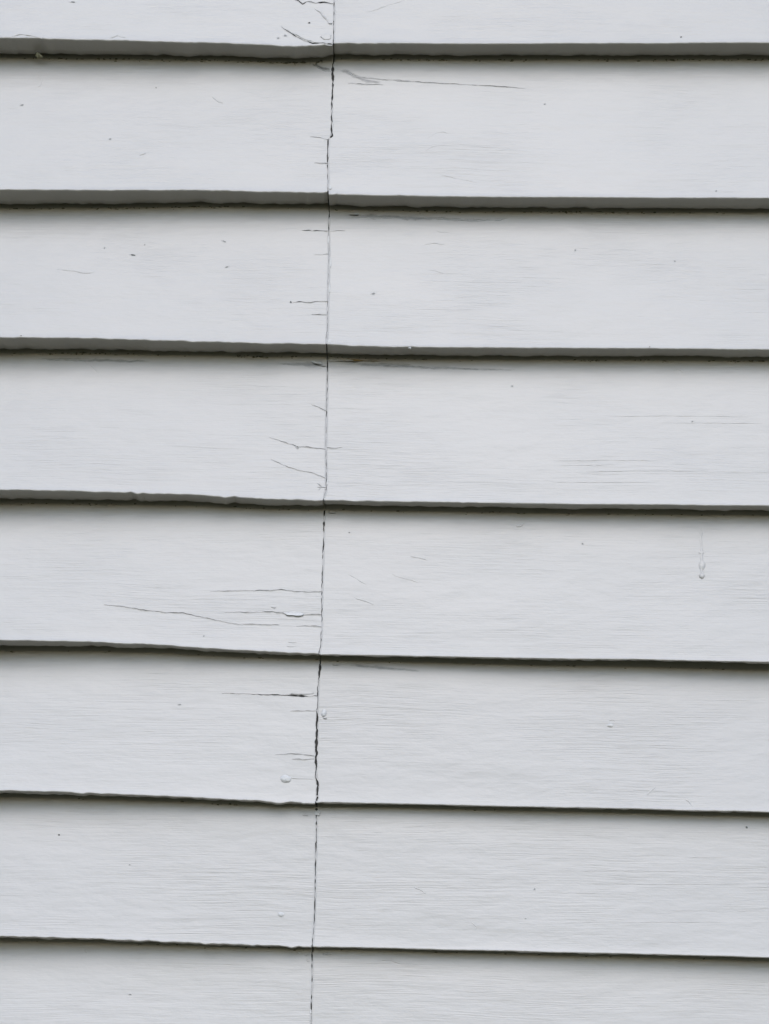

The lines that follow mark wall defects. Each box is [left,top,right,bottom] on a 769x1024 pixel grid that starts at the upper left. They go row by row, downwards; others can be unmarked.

crack [104,0,525,1024]